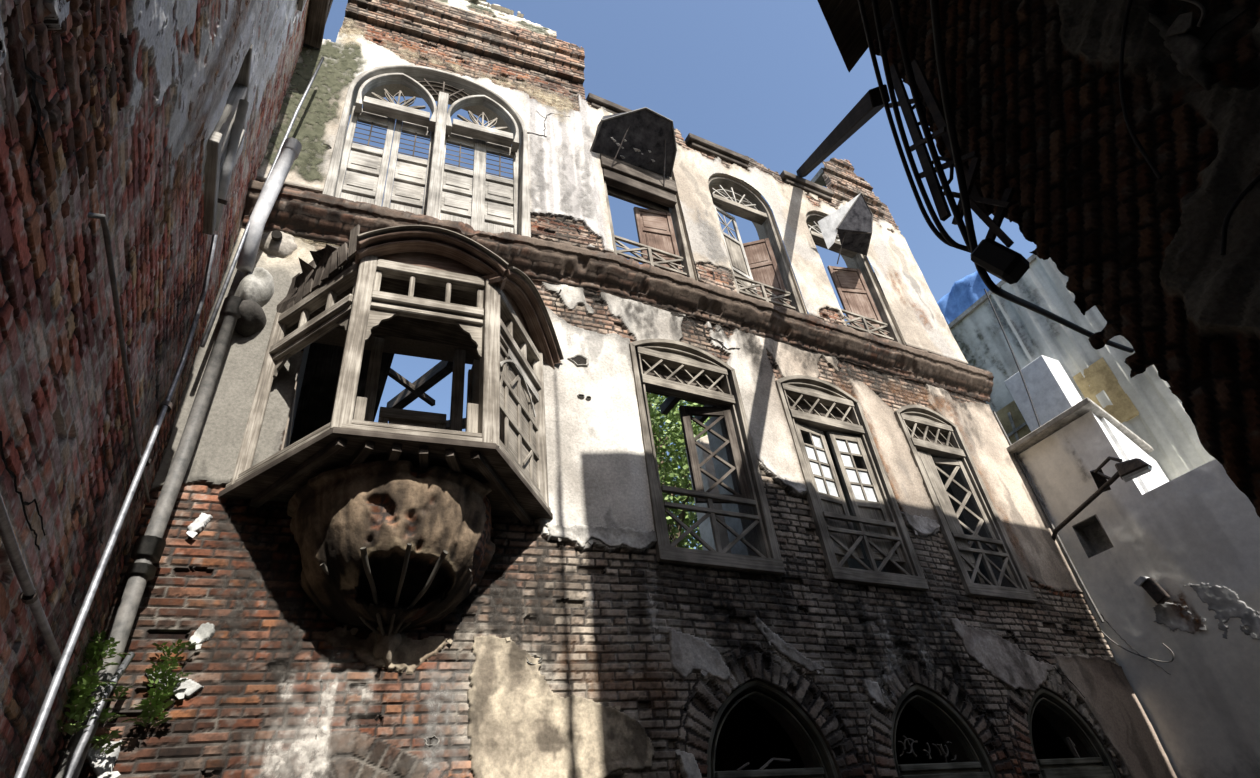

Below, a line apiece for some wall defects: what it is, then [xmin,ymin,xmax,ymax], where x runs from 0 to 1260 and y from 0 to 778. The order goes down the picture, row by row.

spalling [0,0,133,240]
water stain [303,142,327,181]
peeling [186,513,213,538]
peeling [545,521,657,550]
peeling [1153,582,1260,640]
peeling [189,622,216,650]
peeling [319,625,453,674]
peeling [668,630,734,682]
peeling [948,618,1054,692]
peeling [145,672,204,699]
peeling [467,635,655,778]
peeling [87,740,123,778]